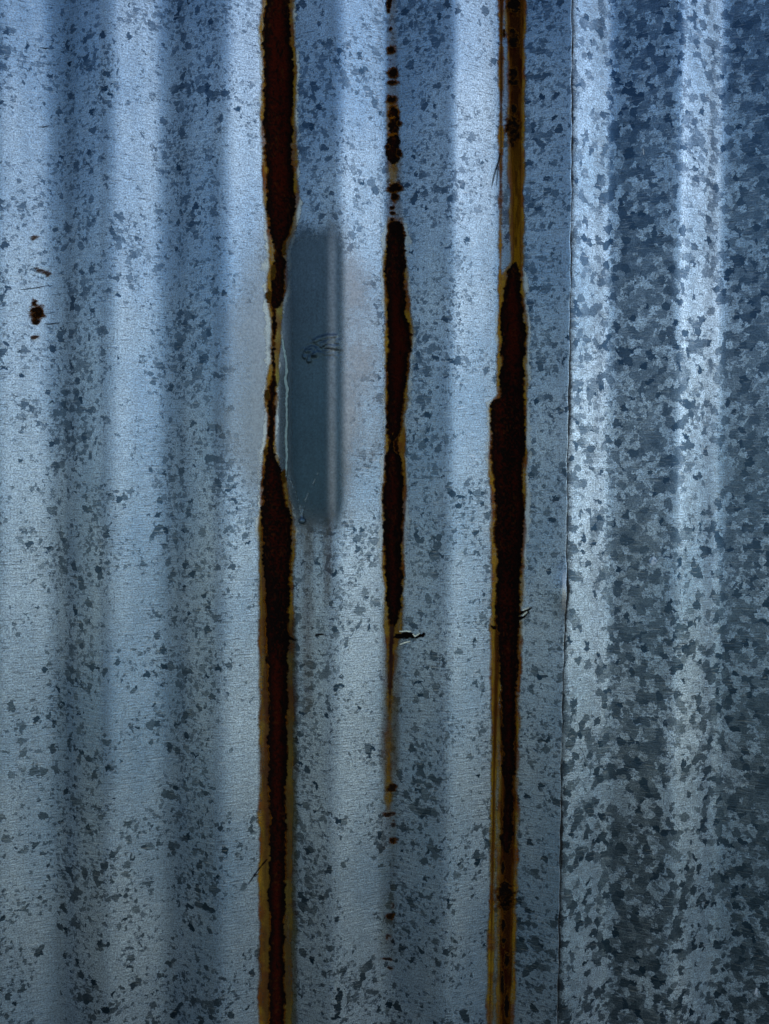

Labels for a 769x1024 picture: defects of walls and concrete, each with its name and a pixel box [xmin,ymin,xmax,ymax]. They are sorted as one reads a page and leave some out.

corrosion [30,299,46,339]
corrosion [255,0,302,1024]
corrosion [378,67,416,844]
corrosion [485,0,532,1024]